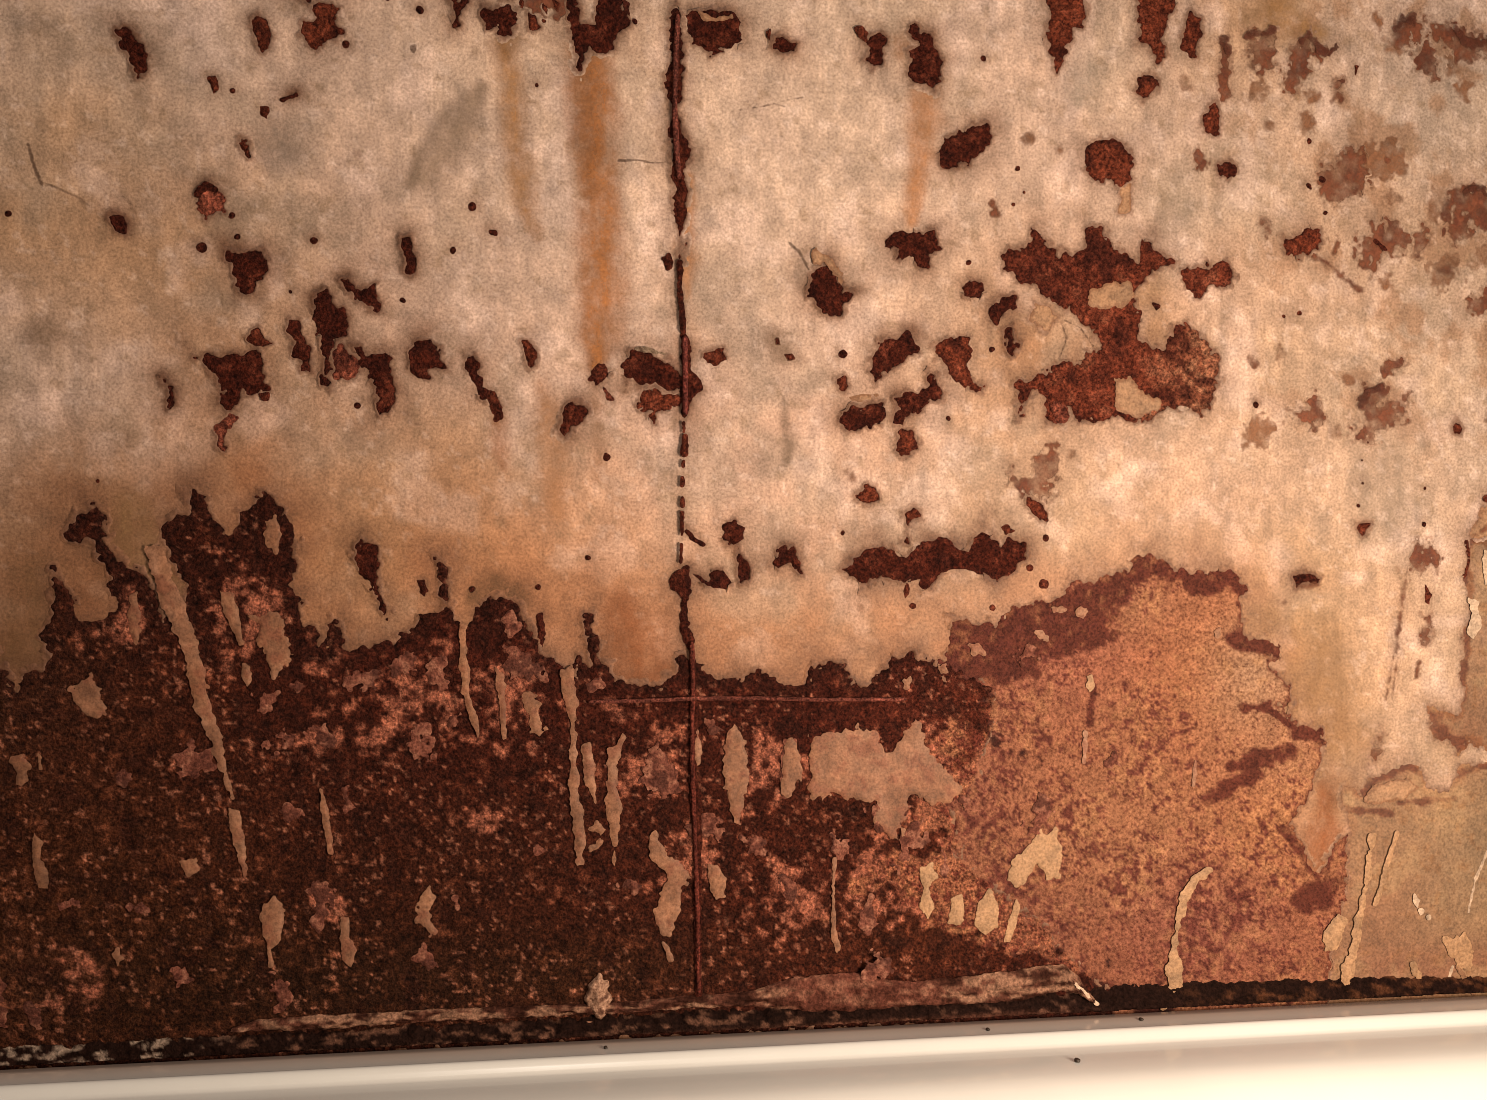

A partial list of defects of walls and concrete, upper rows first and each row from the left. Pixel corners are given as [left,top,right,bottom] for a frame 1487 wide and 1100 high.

peeling [936,118,998,174]
peeling [191,176,275,300]
peeling [793,246,860,324]
peeling [885,223,945,275]
peeling [959,131,1241,430]
peeling [186,230,507,458]
peeling [516,336,543,374]
peeling [550,345,682,444]
peeling [698,339,733,372]
peeling [830,325,989,462]
peeling [1242,351,1416,461]
peeling [0,442,1487,1070]